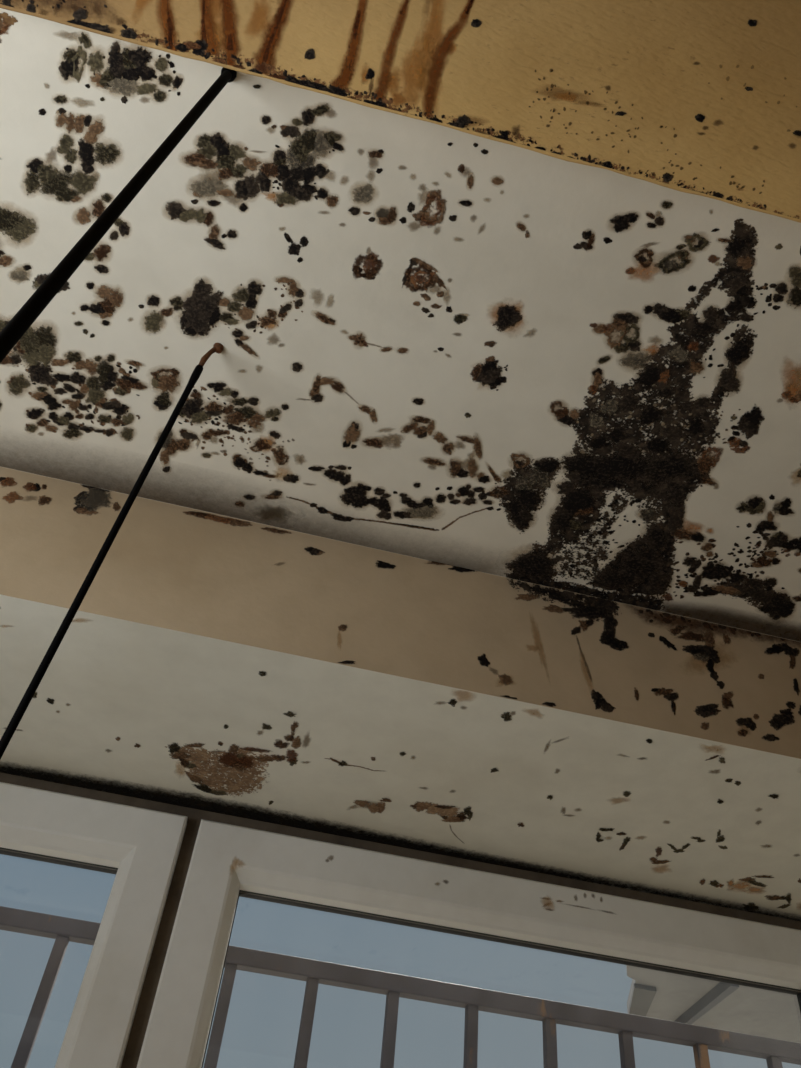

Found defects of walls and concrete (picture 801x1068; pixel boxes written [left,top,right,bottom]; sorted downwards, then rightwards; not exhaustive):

corrosion [0,0,564,155]
water stain [24,32,183,225]
water stain [695,114,722,135]
water stain [166,105,484,250]
water stain [559,142,799,219]
water stain [0,208,36,242]
water stain [573,201,673,251]
water stain [0,219,801,742]
peeling [166,711,310,796]
peeling [350,798,392,814]
peeling [410,801,473,842]
water stain [705,755,741,786]